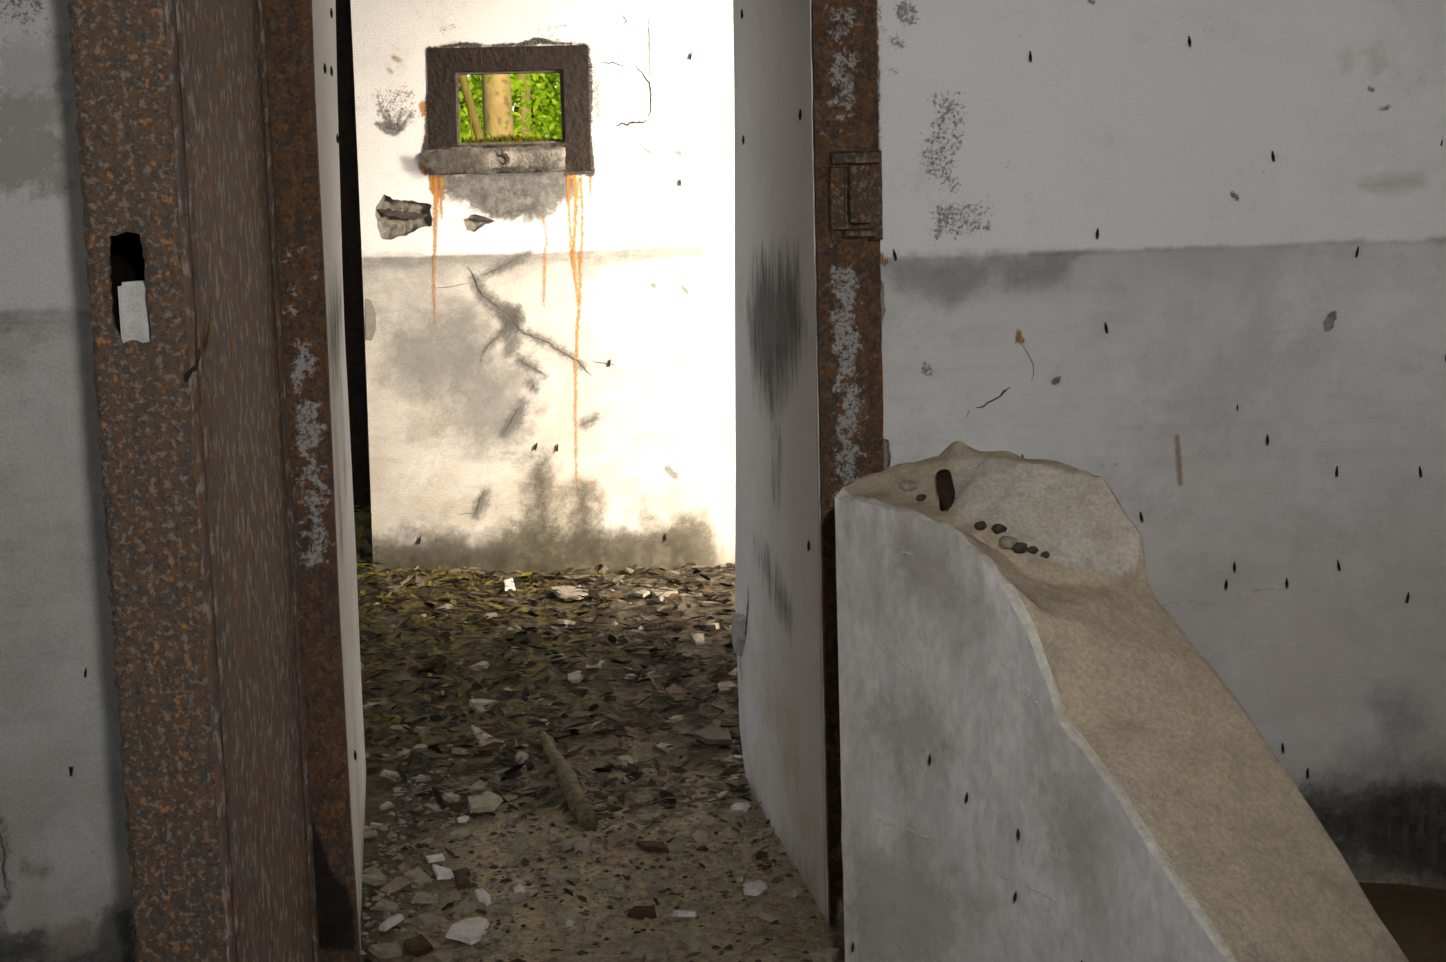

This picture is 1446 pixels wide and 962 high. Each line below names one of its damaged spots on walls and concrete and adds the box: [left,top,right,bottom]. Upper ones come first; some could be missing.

peeling [3,39,64,92]
corrosion [419,162,444,325]
spalling [375,172,574,240]
leakage [463,251,583,441]
corrosion [566,174,593,480]
leakage [749,254,801,400]
crack [0,834,10,897]
leakage [1304,786,1446,890]